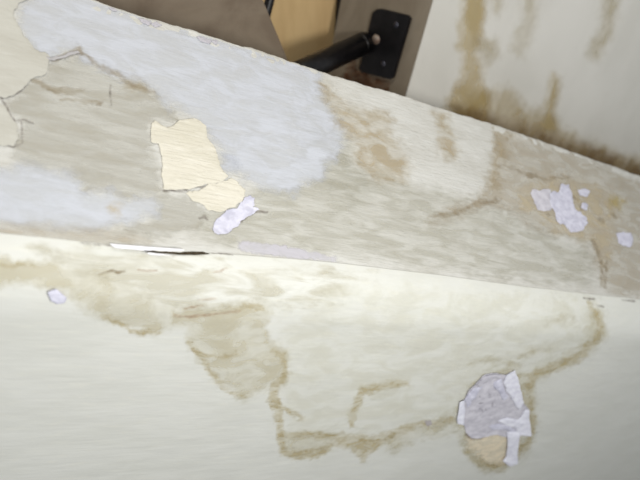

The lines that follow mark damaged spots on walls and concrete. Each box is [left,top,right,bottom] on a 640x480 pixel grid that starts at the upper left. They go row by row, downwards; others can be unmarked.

water stain [466,0,483,51]
peeling [0,0,345,235]
water stain [452,67,492,124]
water stain [362,133,403,170]
flaking render [531,184,590,233]
crack [110,243,227,256]
flaking render [616,232,633,247]
flaking render [457,370,532,467]